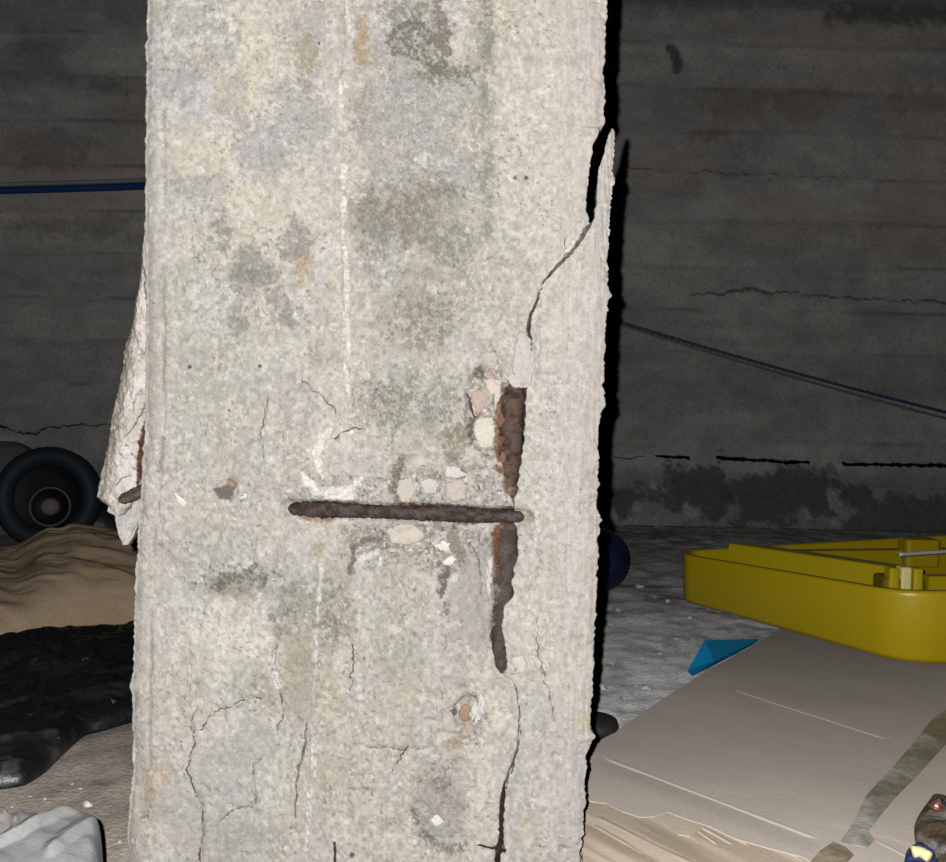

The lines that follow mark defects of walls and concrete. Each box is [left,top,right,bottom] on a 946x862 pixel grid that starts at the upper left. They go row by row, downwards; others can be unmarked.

crack [526,221,592,373]
spalling [274,331,542,675]
rust [493,385,515,494]
crack [613,453,690,461]
crack [716,456,810,464]
damp [608,461,946,534]
crack [842,460,946,468]
rust [491,524,512,597]
crack [186,645,285,861]
crack [294,722,307,818]
crack [477,690,522,862]